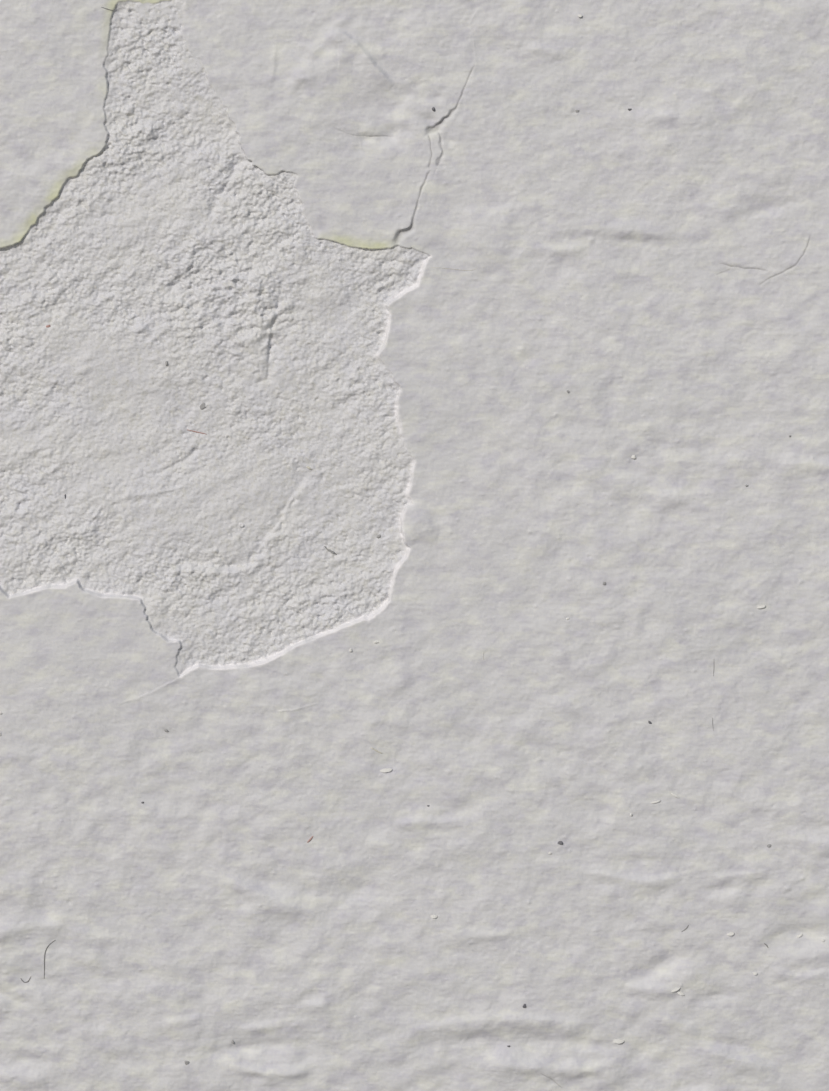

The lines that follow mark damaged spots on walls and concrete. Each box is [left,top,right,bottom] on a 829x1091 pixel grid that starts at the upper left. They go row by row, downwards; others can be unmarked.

peeling [0,0,442,680]
crack [333,4,482,230]